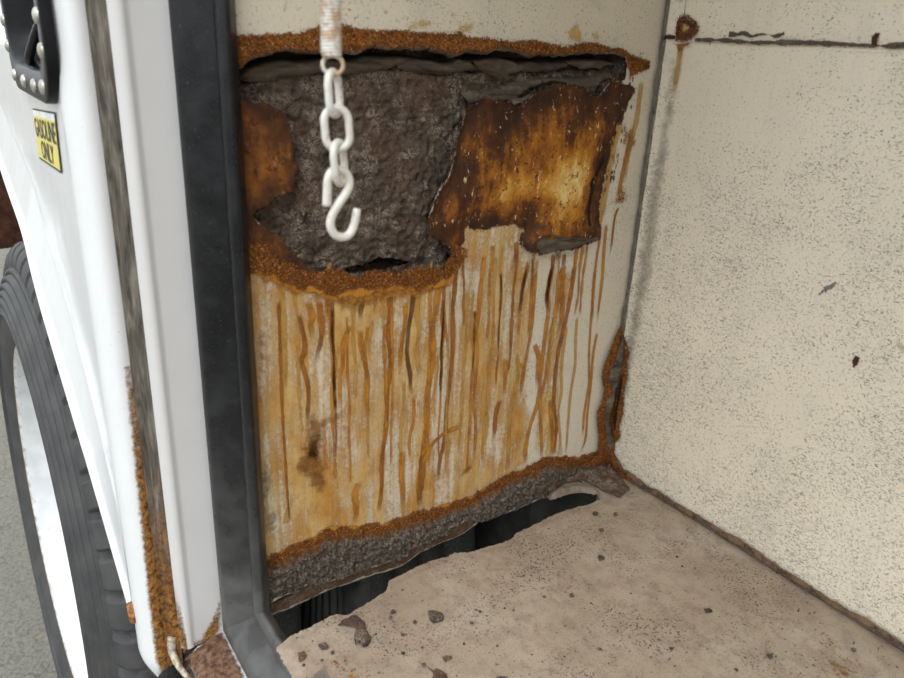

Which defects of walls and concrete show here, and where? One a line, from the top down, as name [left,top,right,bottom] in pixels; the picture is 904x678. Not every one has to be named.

crack [695,31,904,49]
rust [237,0,904,652]
rust [125,366,243,678]